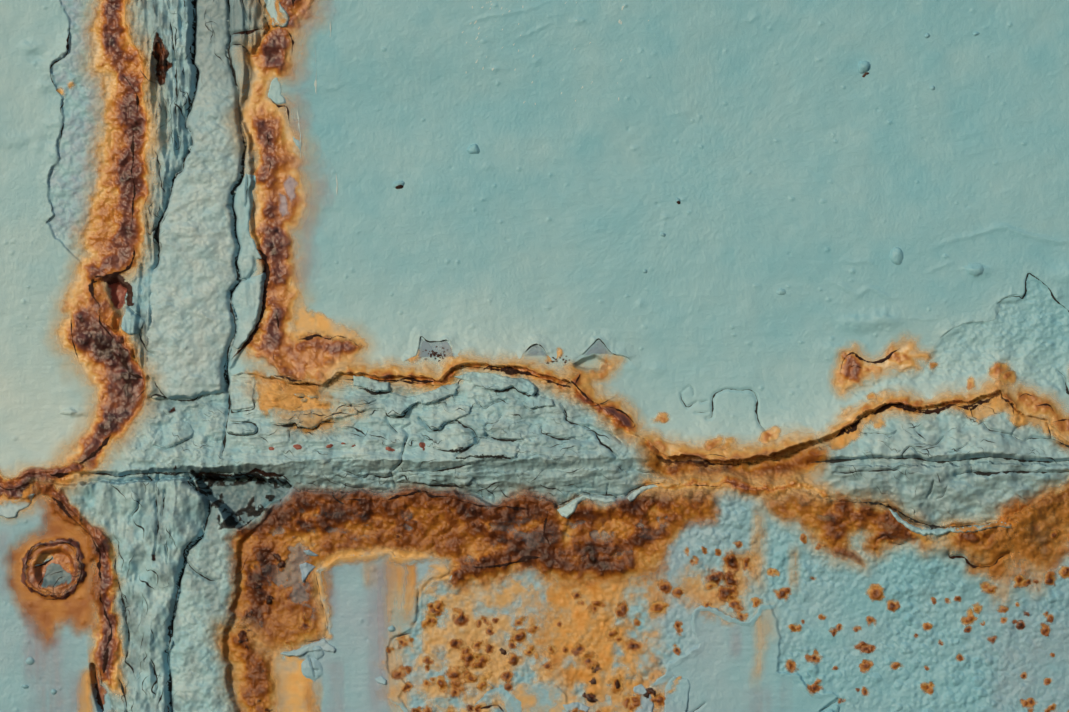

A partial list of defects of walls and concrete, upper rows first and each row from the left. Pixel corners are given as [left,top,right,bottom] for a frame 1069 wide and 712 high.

peeling [230,173,266,350]
peeling [929,255,1069,347]
rust [0,0,155,712]
rust [220,0,1069,712]
peeling [152,421,194,449]
peeling [227,371,257,436]
peeling [268,372,555,459]
crack [681,388,761,426]
peeling [396,472,473,488]
peeling [557,485,658,519]